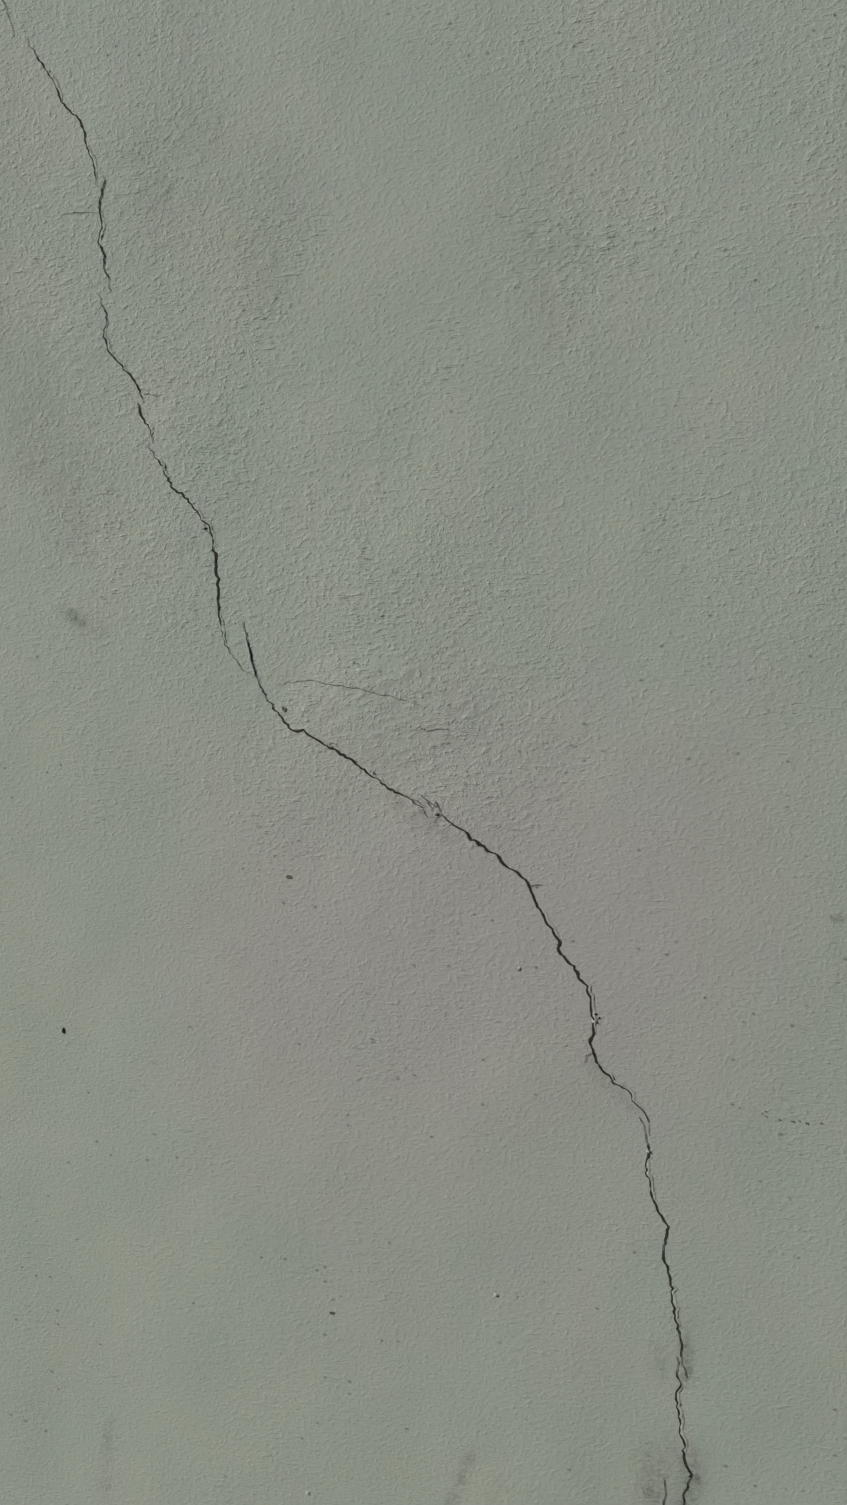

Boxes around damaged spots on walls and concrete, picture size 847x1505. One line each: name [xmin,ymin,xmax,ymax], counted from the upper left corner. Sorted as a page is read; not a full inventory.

crack [27,37,692,1505]